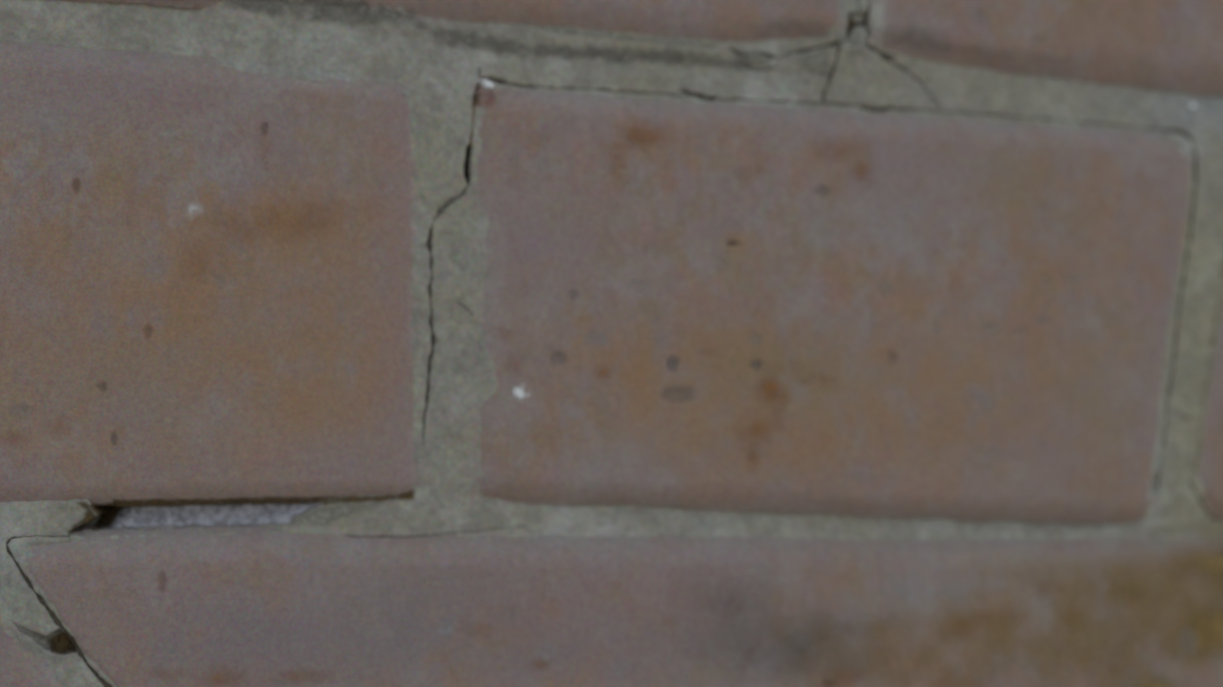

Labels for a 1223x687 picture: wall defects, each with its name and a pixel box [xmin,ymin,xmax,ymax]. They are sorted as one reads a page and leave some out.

crack [423,0,1197,499]
crack [6,535,112,687]